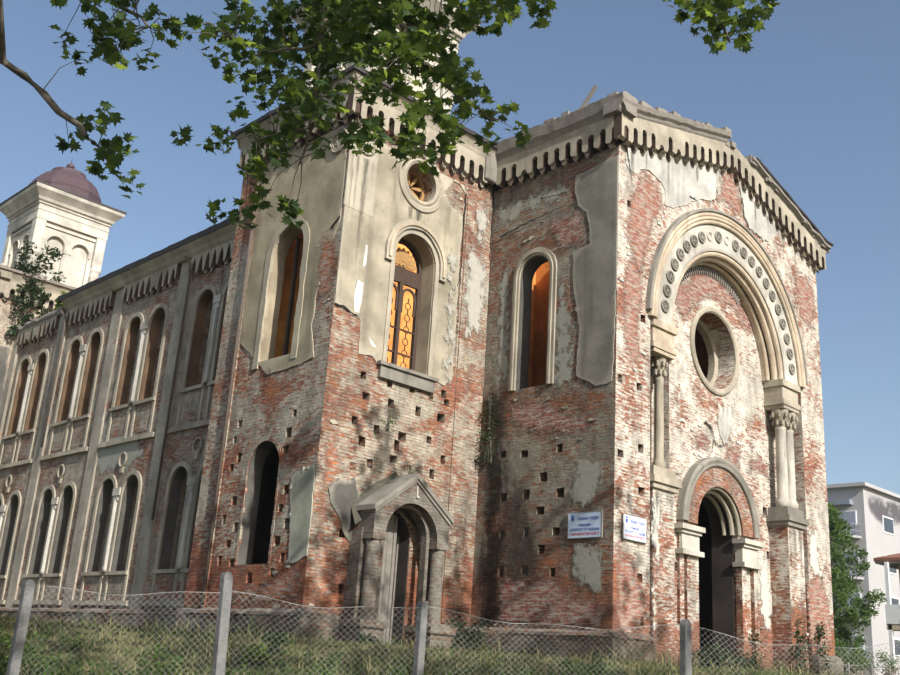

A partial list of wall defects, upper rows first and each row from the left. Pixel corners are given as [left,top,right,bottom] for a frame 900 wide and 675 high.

flaking render [443,177,512,384]
flaking render [619,175,669,371]
flaking render [674,266,755,342]
flaking render [794,271,816,329]
flaking render [511,398,596,440]
flaking render [308,419,357,606]
damp [481,396,505,625]
flaking render [569,459,605,508]
flaking render [651,496,661,564]
flaking render [494,543,657,633]
flaking render [758,551,772,630]
flaking render [806,530,832,648]